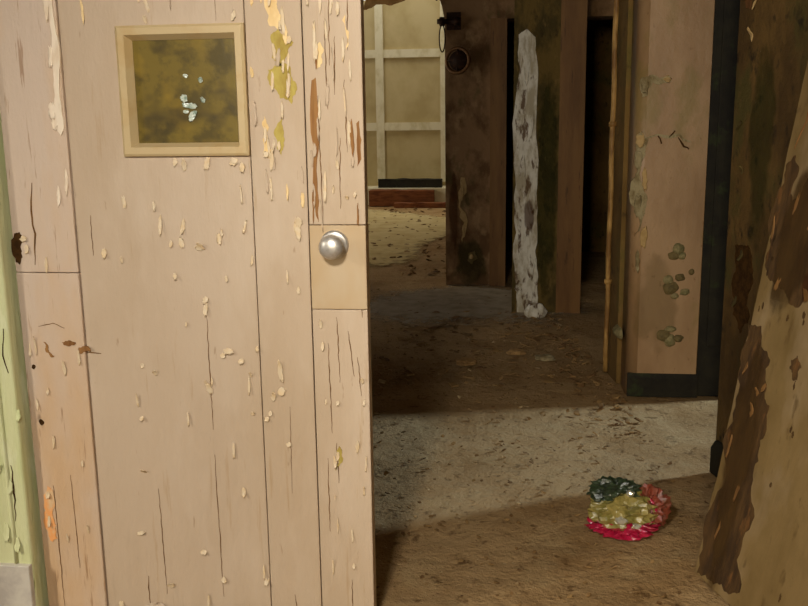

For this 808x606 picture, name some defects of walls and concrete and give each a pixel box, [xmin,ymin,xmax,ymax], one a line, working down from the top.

peeling [43,0,65,136]
peeling [180,94,205,122]
peeling [250,0,297,201]
peeling [300,0,361,230]
peeling [512,29,539,312]
peeling [11,232,29,265]
peeling [731,244,754,333]
peeling [62,340,91,365]
peeling [44,486,69,543]